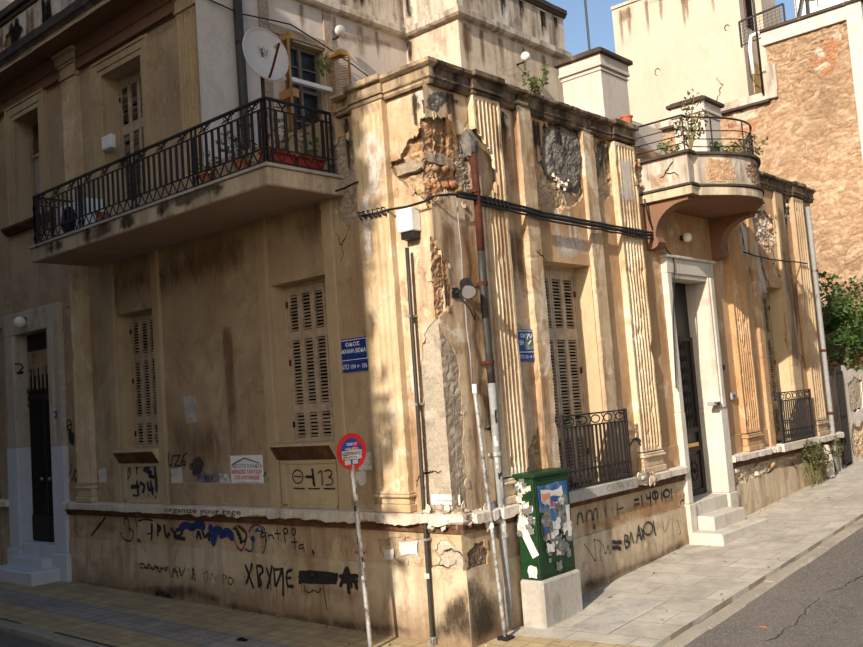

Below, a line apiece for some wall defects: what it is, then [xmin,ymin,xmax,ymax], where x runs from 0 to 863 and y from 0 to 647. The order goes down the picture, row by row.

leakage [540,10,557,35]
flaking render [390,112,471,208]
flaking render [537,121,580,213]
flaking render [739,196,790,298]
flaking render [378,236,502,571]
flaking render [848,374,863,410]
flaking render [851,420,863,460]